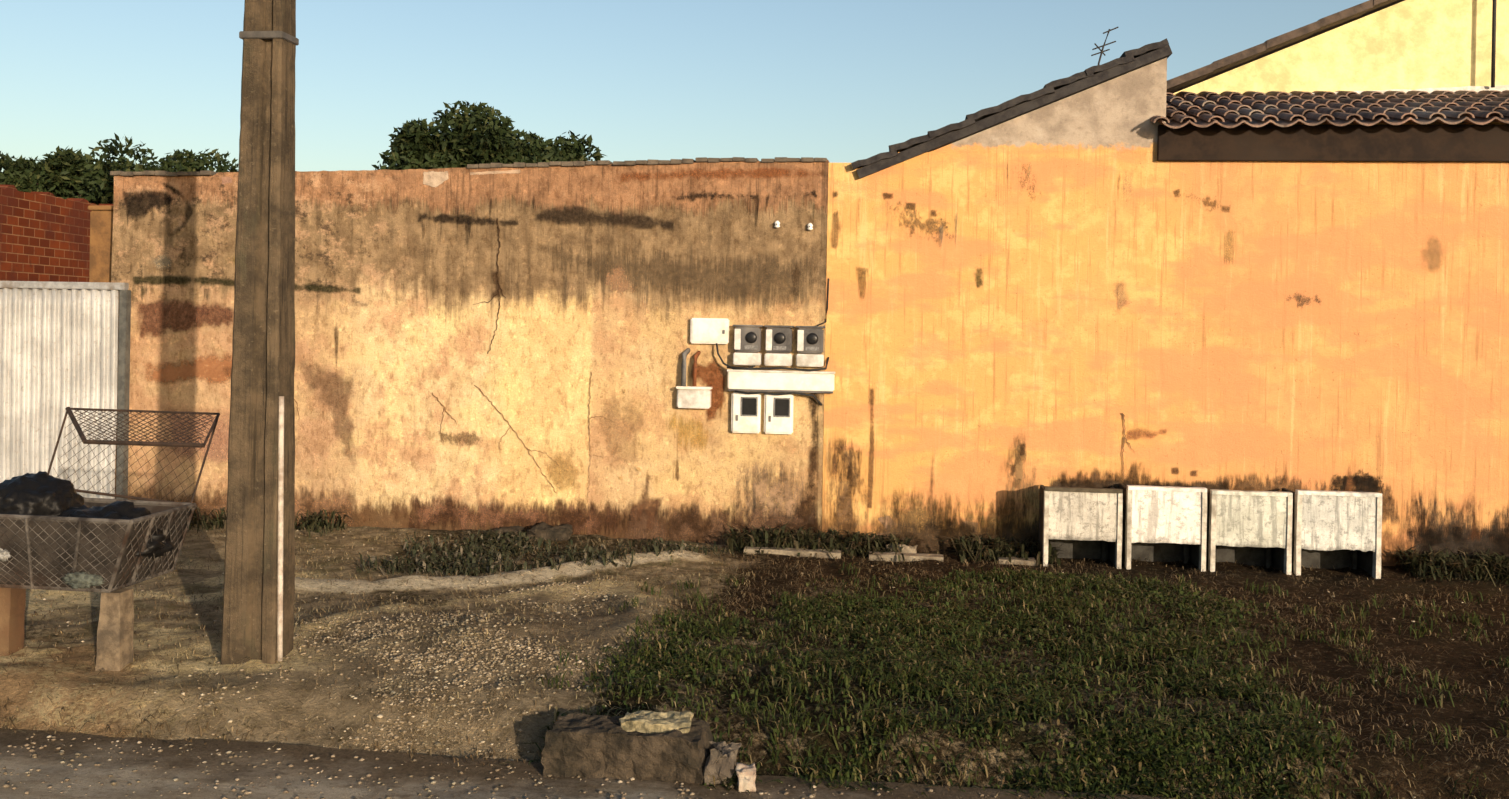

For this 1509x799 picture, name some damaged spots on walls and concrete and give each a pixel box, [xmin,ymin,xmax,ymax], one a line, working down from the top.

water stain [419,200,517,239]
water stain [533,199,673,229]
water stain [677,191,840,248]
water stain [552,247,812,305]
crack [473,218,616,502]
crack [432,392,457,443]
rust [691,361,725,420]
water stain [409,389,1509,562]